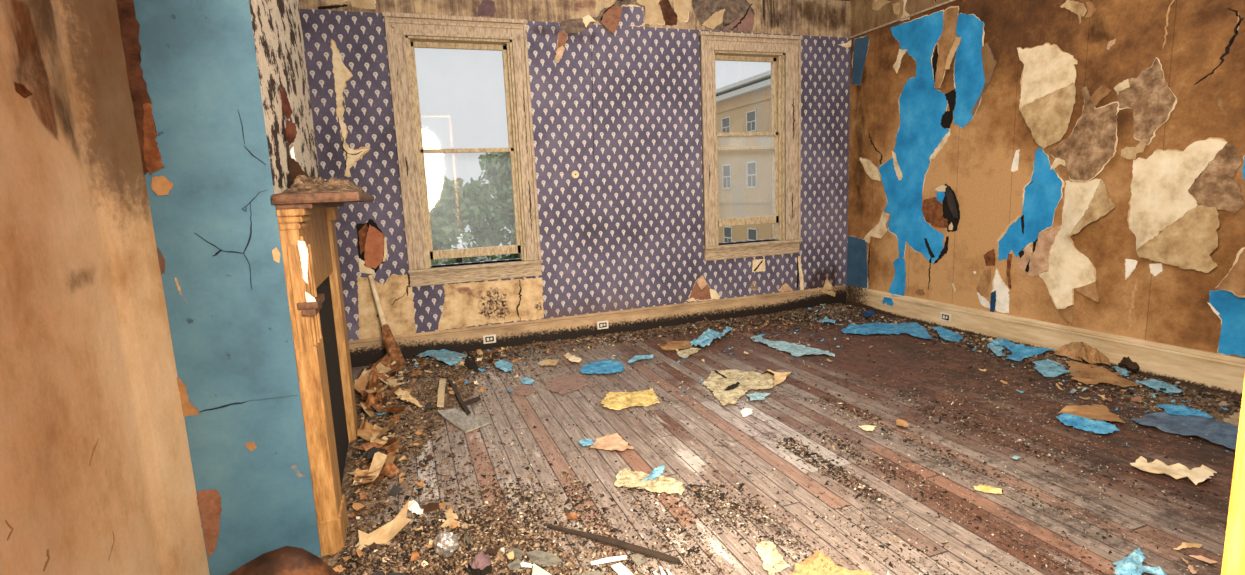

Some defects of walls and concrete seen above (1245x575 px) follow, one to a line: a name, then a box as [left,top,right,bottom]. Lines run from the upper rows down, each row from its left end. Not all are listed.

damp [12,0,74,142]
flaking render [116,0,174,196]
peeling [279,85,297,161]
flaking render [559,0,755,34]
peeling [872,0,996,306]
crack [1194,8,1244,85]
crack [194,109,266,288]
peeling [996,148,1065,260]
peeling [759,306,888,348]
peeling [1207,290,1245,357]
crack [200,395,298,412]